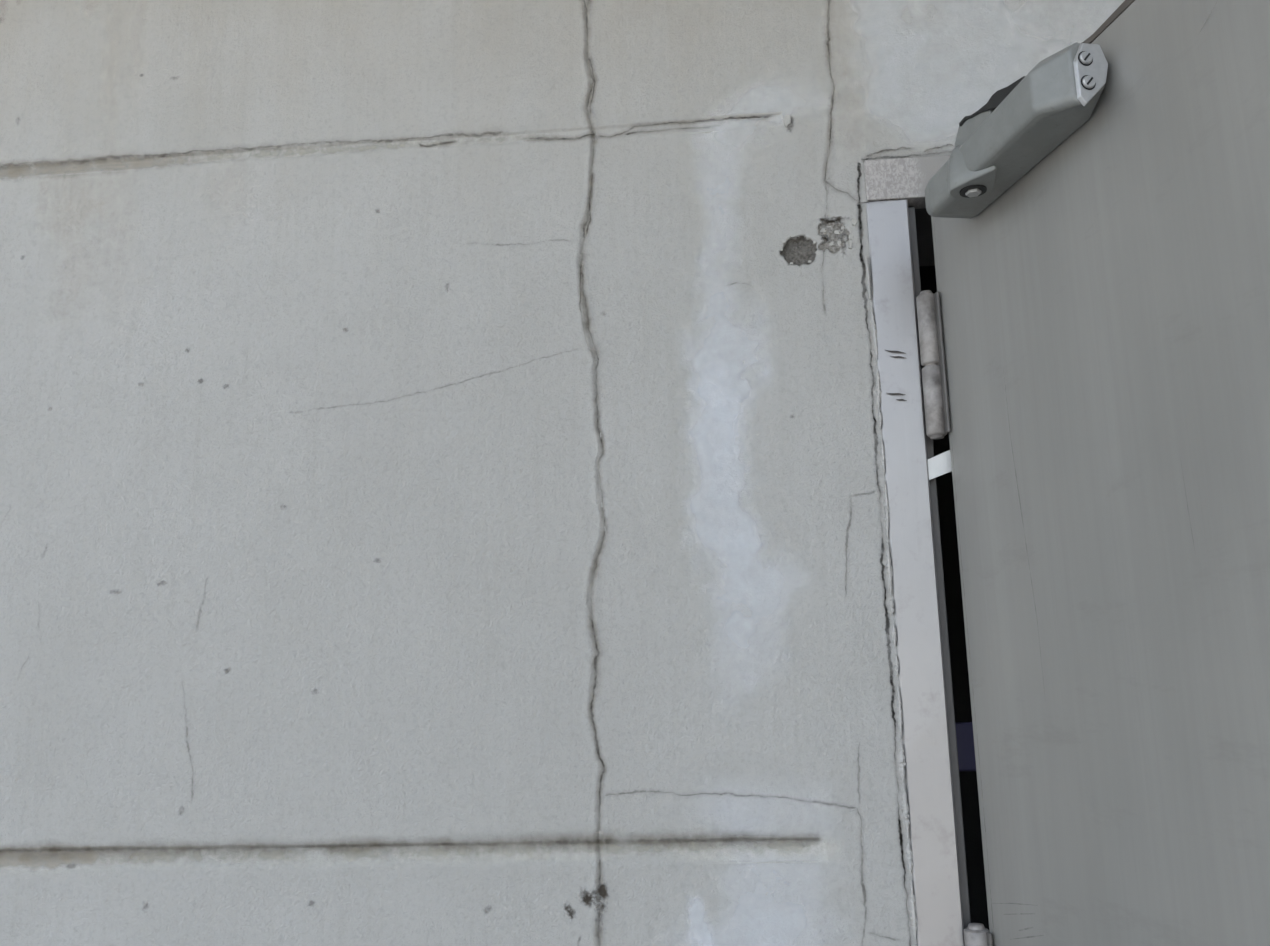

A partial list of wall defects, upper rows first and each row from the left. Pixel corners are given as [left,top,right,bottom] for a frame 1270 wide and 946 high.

crack [537,4,769,140]
crack [580,175,603,447]
spalling [780,216,857,266]
crack [824,0,951,499]
crack [590,620,605,808]
crack [880,538,896,757]
peeling [865,256,918,946]
crack [44,846,121,854]
crack [312,842,388,850]
crack [529,837,772,938]
crack [897,796,911,946]